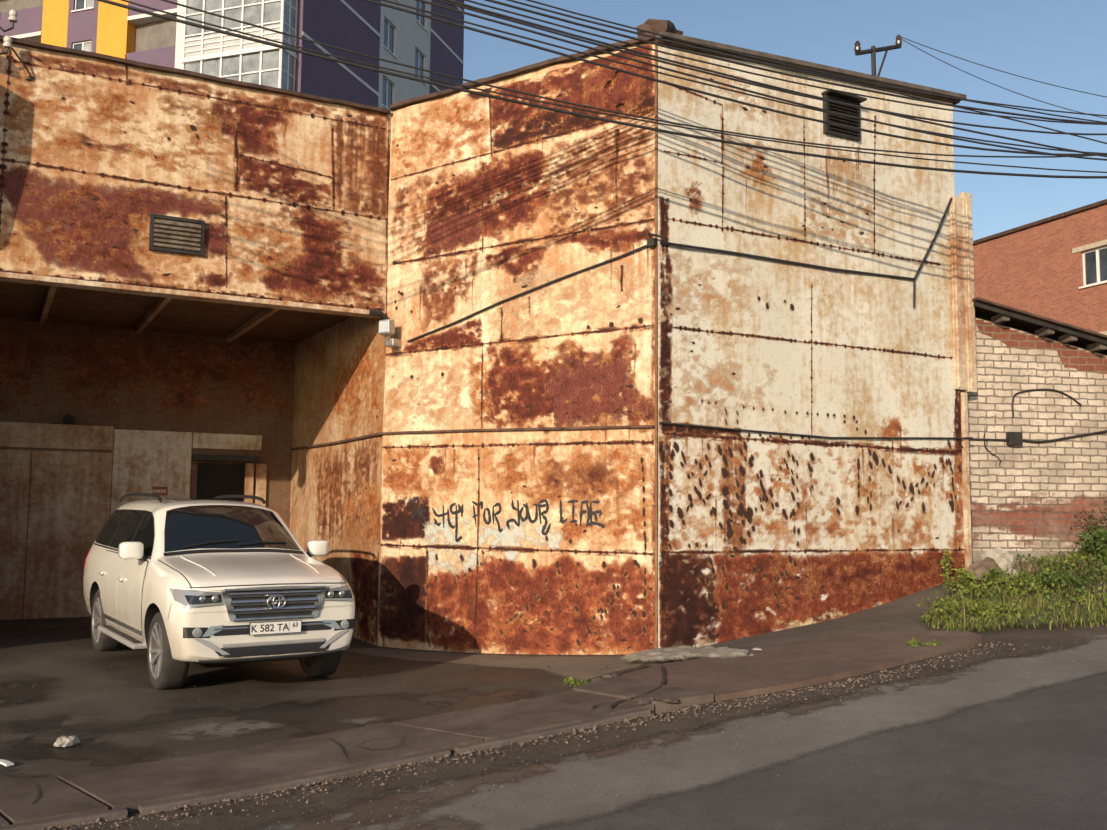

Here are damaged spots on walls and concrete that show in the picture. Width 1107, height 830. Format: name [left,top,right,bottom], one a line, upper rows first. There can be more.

rust [0,44,966,655]
peeling [975,320,1107,374]
peeling [971,495,1107,546]
crack [585,663,677,709]